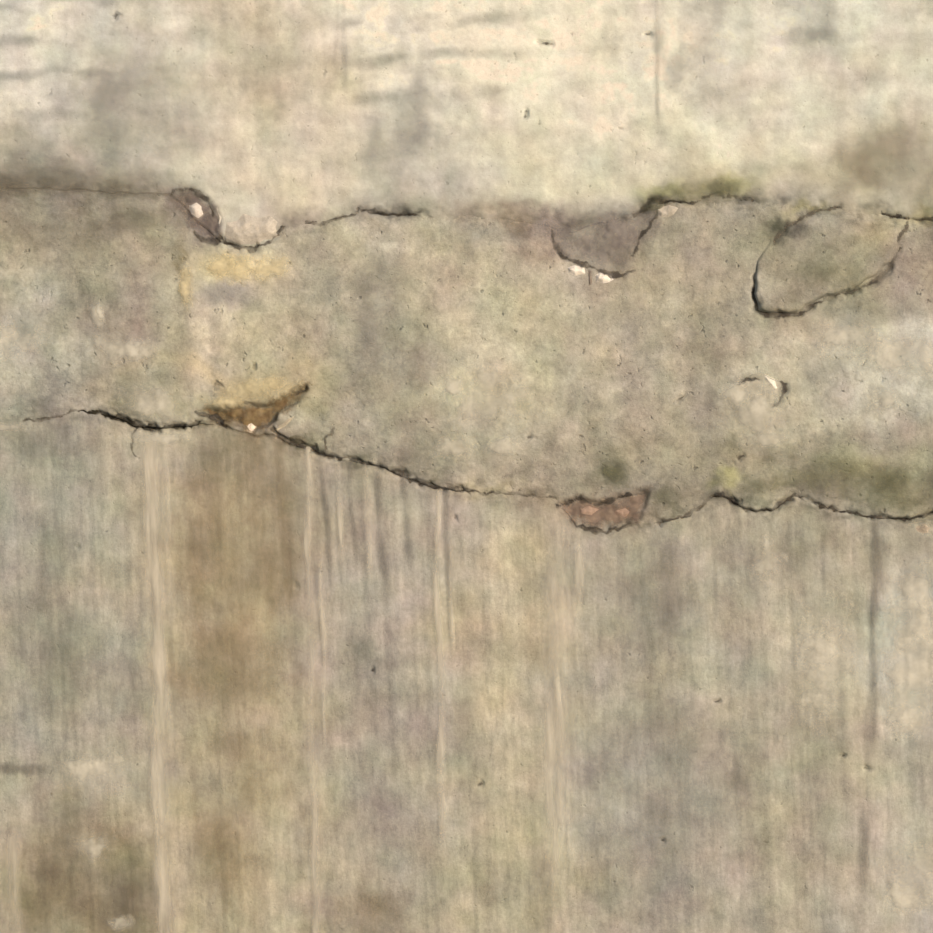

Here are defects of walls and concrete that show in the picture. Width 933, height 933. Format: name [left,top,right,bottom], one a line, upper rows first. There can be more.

spalling [173,188,285,252]
spalling [552,205,678,286]
crack [752,212,933,318]
crack [25,410,200,455]
leakage [138,390,173,417]
spalling [195,387,306,433]
crack [271,429,493,495]
spalling [556,492,646,534]
crack [662,491,925,522]
leakage [153,621,167,727]
leakage [802,633,842,706]
leakage [888,578,933,732]